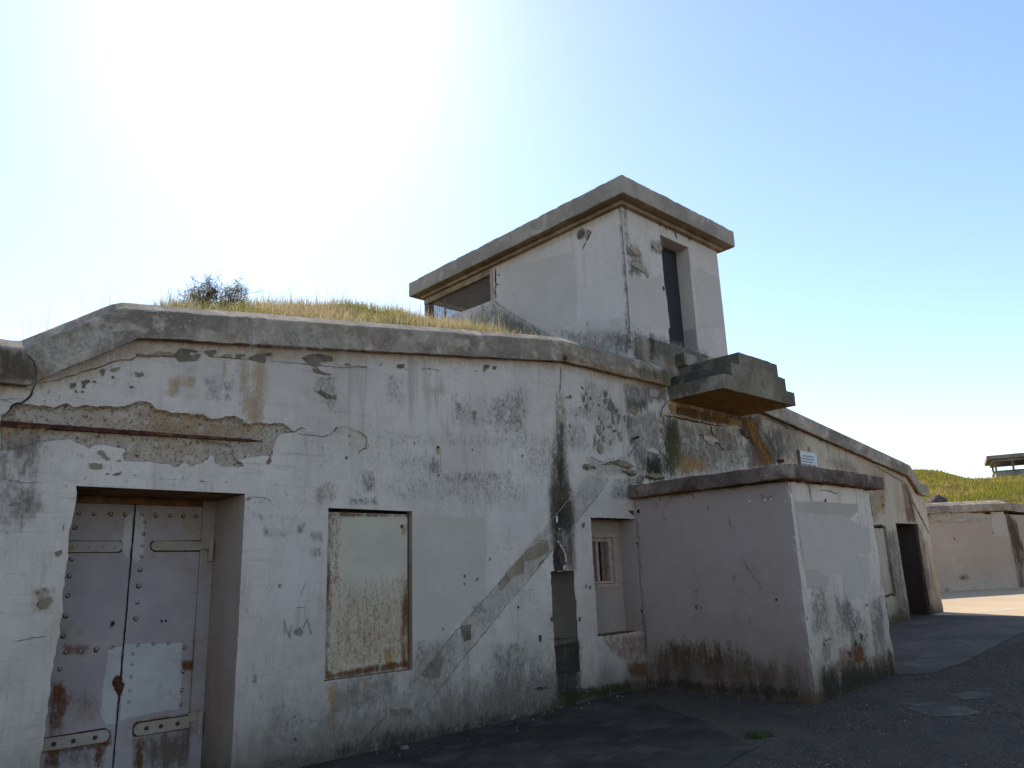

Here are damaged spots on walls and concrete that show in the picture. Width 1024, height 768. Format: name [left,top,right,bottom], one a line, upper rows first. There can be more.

crack [0,349,170,415]
peeling [136,348,272,362]
peeling [302,353,337,400]
spalling [0,367,293,476]
peeling [566,381,626,454]
leakage [614,334,744,498]
leakage [551,396,574,569]
corrosion [50,684,71,730]
corrosion [112,675,125,697]
corrosion [326,588,409,711]
leakage [646,644,797,698]
corrosion [45,732,111,768]